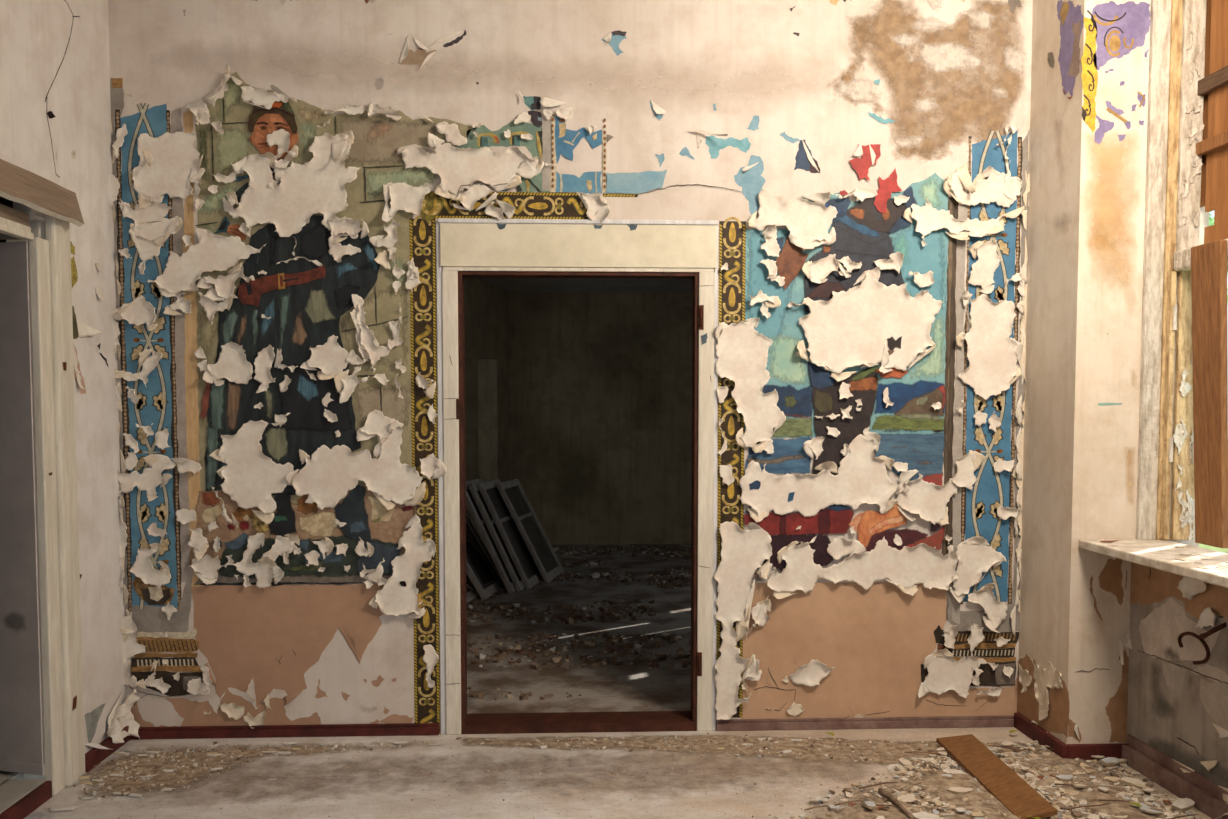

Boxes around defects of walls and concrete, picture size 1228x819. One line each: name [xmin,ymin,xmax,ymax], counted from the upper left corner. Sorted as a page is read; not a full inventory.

spalling [1008,0,1022,12]
spalling [601,30,627,56]
leakage [836,0,1024,159]
spalling [1048,0,1150,144]
spalling [650,100,666,121]
peeling [577,192,610,229]
spalling [70,241,78,288]
peeling [72,62,574,750]
peeling [634,109,1082,742]
spalling [1077,419,1228,743]
peeling [1172,759,1218,773]